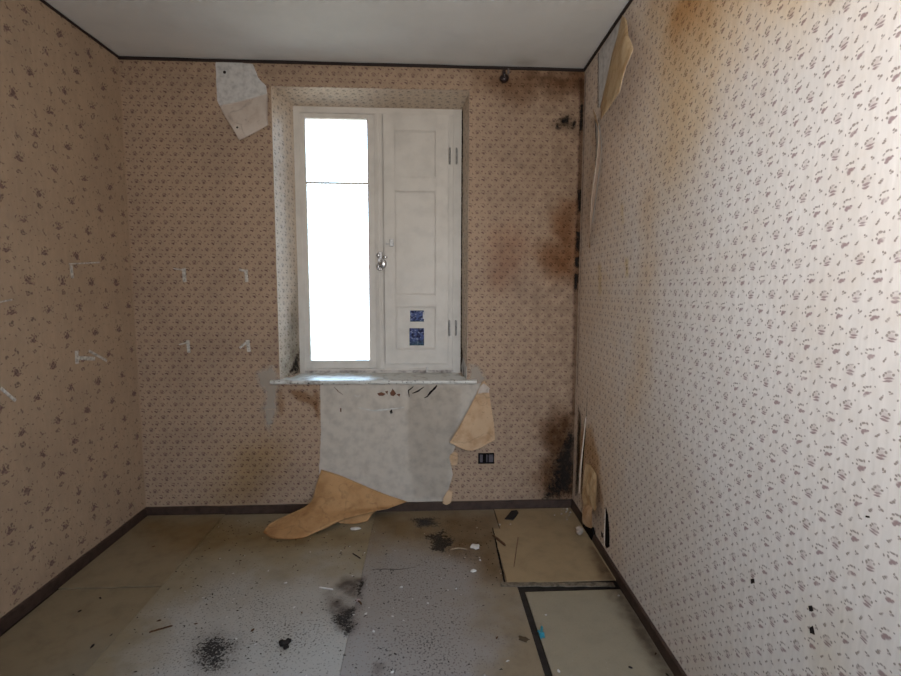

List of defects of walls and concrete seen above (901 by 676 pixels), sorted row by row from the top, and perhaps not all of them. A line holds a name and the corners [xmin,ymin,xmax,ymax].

flaking render [216,62,267,105]
water stain [556,104,583,131]
flaking render [589,15,625,248]
flaking render [319,358,490,502]
water stain [542,414,580,499]